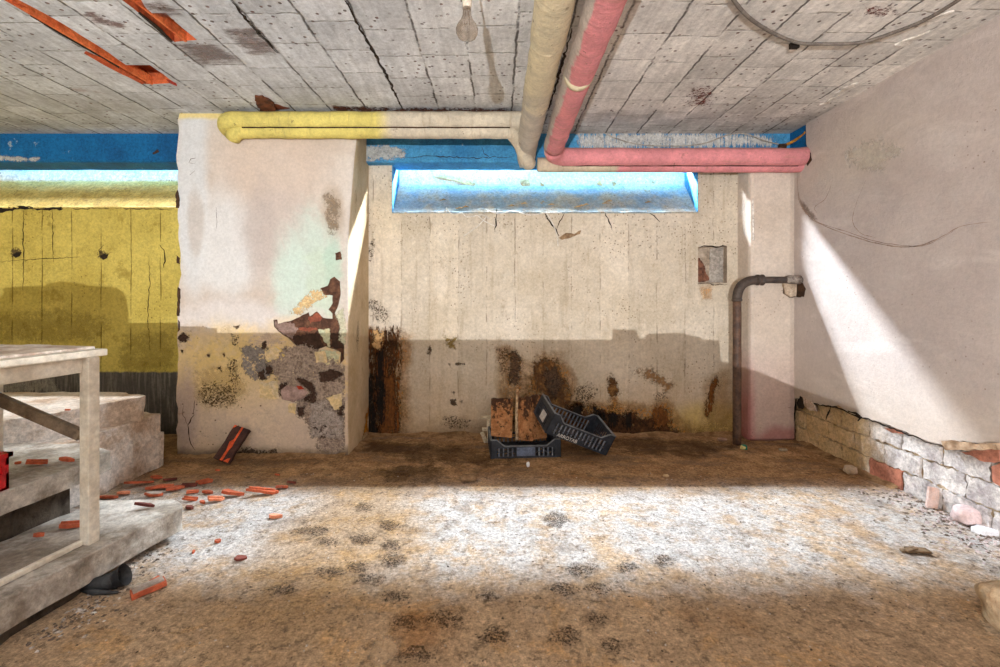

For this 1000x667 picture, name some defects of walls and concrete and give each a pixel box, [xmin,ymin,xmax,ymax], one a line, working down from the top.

crack [232,2,277,53]
crack [344,0,402,108]
crack [4,212,72,282]
crack [147,246,166,347]
spalling [199,277,359,454]
flaking render [795,396,1000,537]